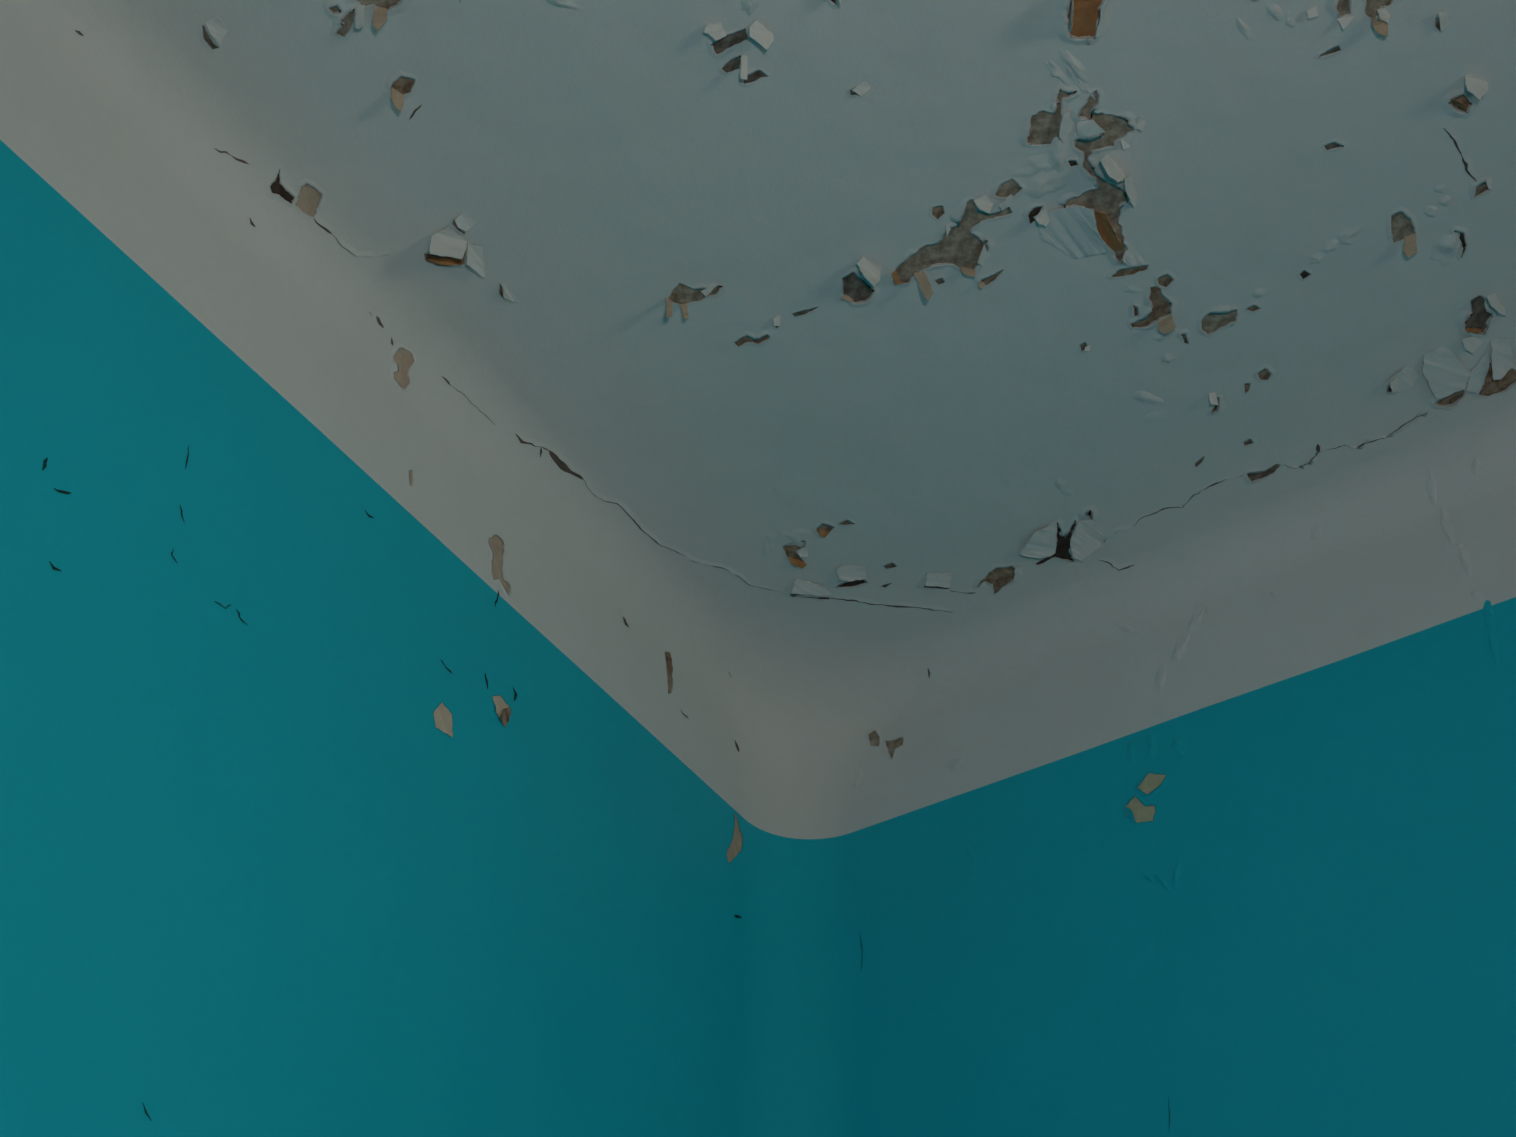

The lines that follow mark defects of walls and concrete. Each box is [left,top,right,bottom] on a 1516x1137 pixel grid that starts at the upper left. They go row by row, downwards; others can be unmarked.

peeling [703,21,774,88]
peeling [1054,0,1116,46]
crack [214,148,250,165]
peeling [420,212,519,303]
peeling [731,81,1264,349]
crack [369,312,393,346]
peeling [1382,292,1516,411]
crack [1280,412,1431,469]
crack [442,376,976,613]
peeling [780,517,900,601]
peeling [972,504,1103,596]
crack [1098,472,1243,571]